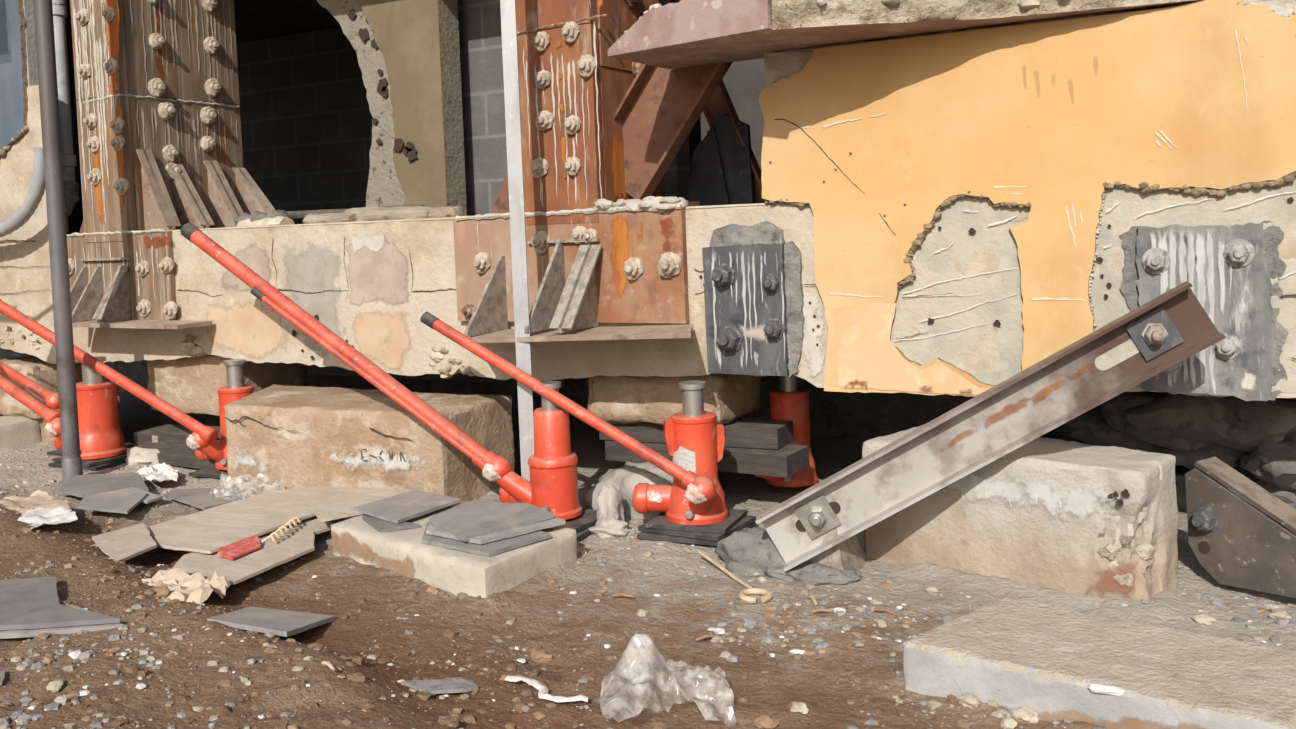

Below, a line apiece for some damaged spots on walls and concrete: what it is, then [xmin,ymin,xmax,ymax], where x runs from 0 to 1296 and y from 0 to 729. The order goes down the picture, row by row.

spalling [0,85,55,349]
rust [93,0,124,223]
rust [608,134,630,199]
rust [610,216,643,297]
rust [660,218,674,251]
damp [712,252,785,368]
spalling [890,191,1031,385]
damp [1156,345,1217,393]
spalling [1089,171,1296,331]
damp [1150,230,1248,347]
damp [1241,372,1256,389]
spalling [1270,258,1296,393]